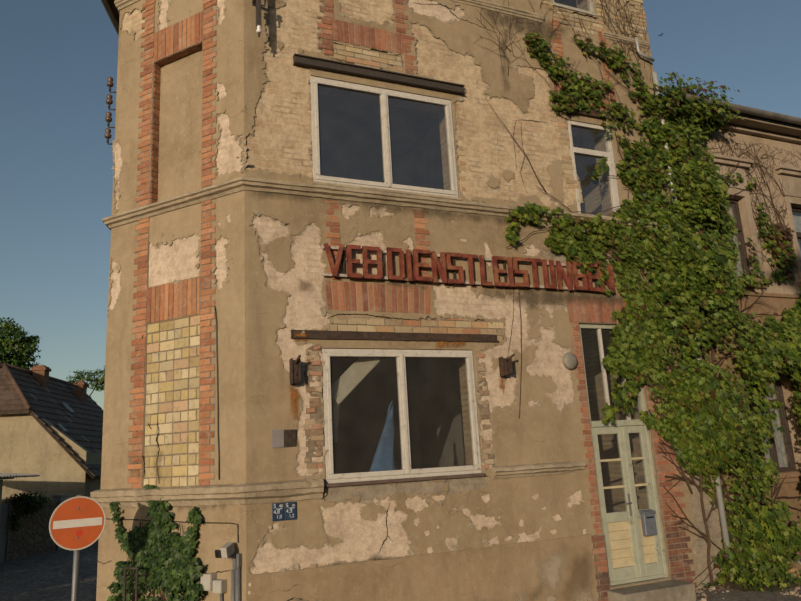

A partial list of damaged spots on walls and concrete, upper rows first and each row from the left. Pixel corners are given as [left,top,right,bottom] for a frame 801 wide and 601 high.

flaking render [121,0,175,40]
flaking render [213,0,403,183]
flaking render [337,0,584,209]
flaking render [148,214,233,292]
flaking render [250,200,577,479]
crack [135,423,160,478]
corrosion [291,388,299,418]
flaking render [248,490,585,594]